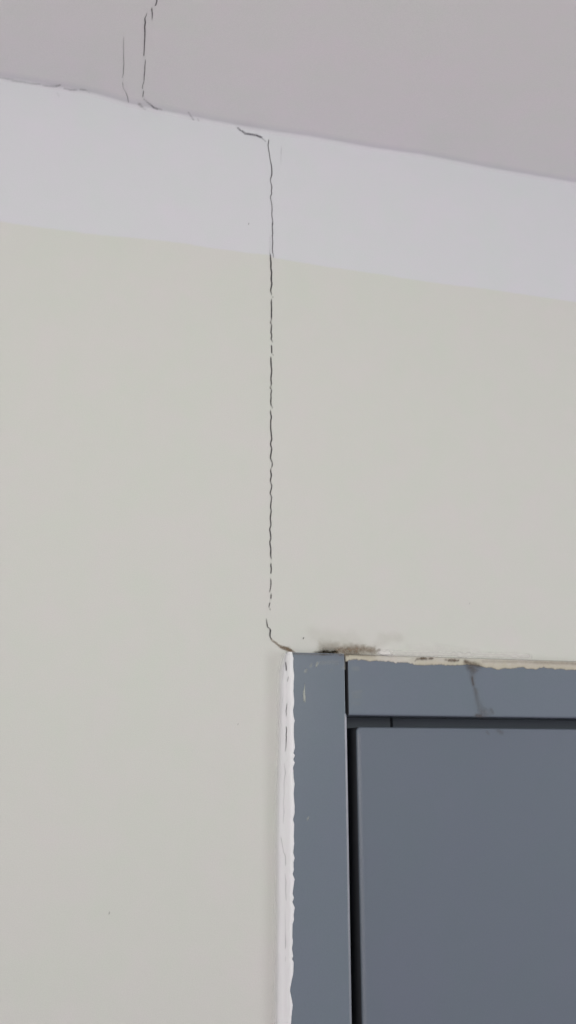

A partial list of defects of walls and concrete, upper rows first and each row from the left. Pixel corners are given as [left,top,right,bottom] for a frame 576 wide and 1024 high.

crack [142,0,157,94]
crack [250,134,291,670]